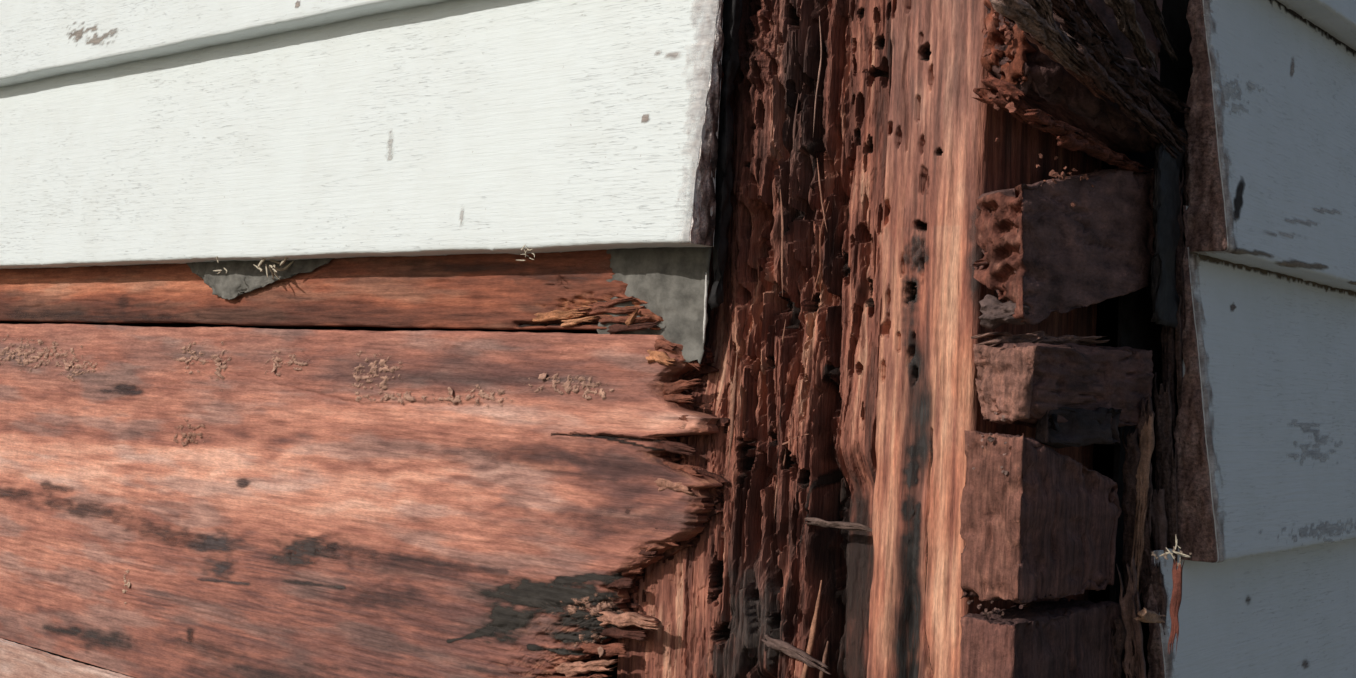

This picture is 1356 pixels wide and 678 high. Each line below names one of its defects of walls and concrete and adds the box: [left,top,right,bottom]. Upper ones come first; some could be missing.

peeling [69,26,117,45]
peeling [990,0,1123,103]
peeling [983,72,1150,187]
spalling [0,296,677,351]
peeling [661,361,704,421]
crack [551,433,666,451]
peeling [1088,249,1224,678]
damp [447,572,625,655]
peeling [967,600,1004,616]
spalling [2,638,135,678]
peeling [555,626,648,678]